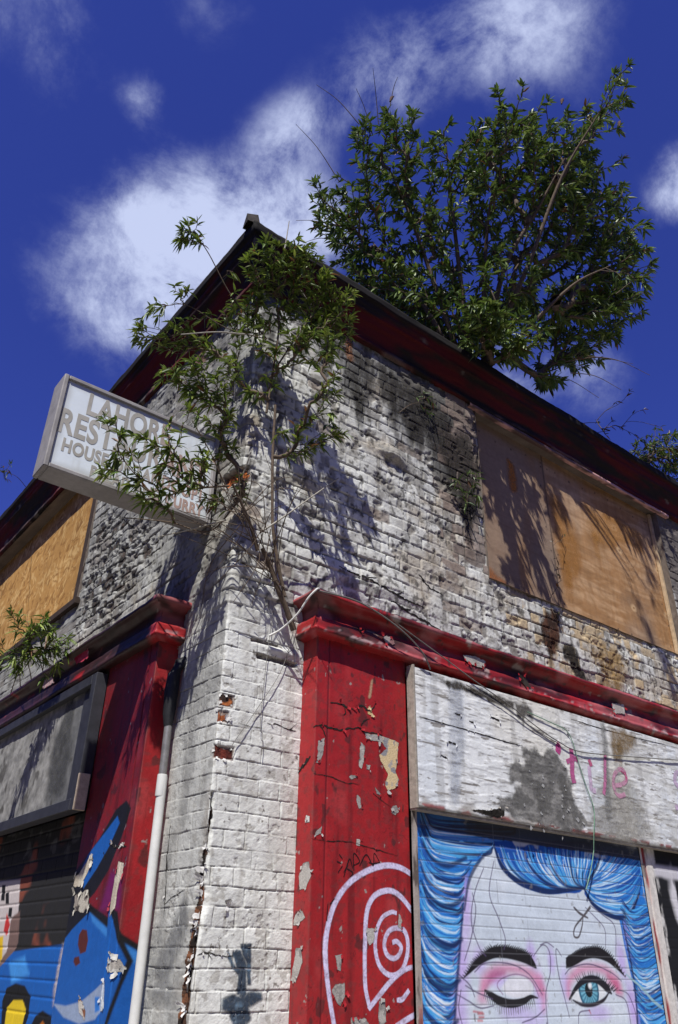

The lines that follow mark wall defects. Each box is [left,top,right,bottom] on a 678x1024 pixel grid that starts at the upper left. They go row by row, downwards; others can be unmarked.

flaking render [215,692,233,723]
flaking render [211,741,232,762]
peeling [349,733,400,815]
leakage [500,724,648,841]
peeling [72,853,93,915]
peeling [107,861,124,915]
crack [163,795,232,1024]
peeling [97,951,127,1011]